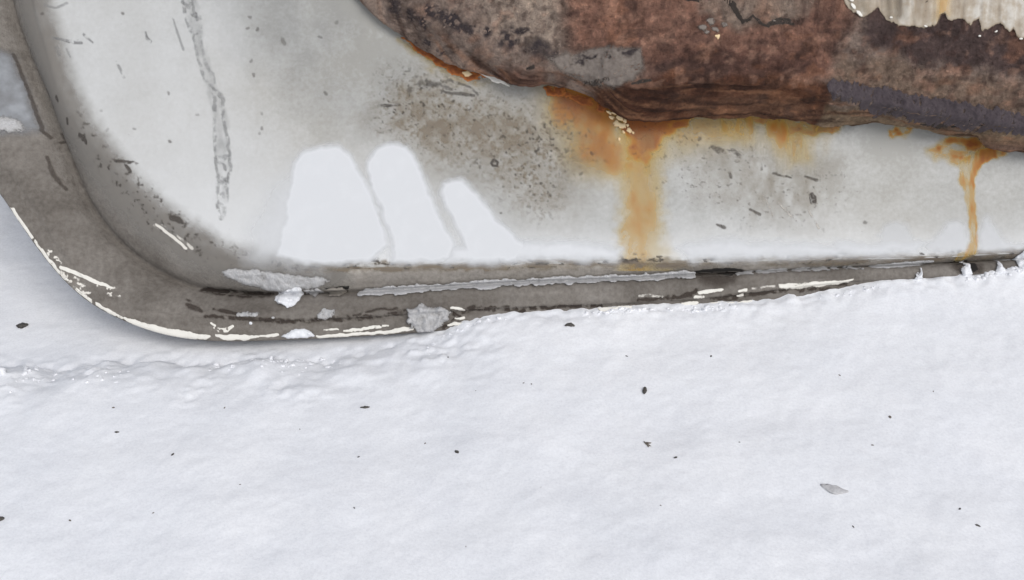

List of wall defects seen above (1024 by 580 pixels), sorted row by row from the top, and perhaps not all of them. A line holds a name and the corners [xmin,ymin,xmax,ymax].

rust [698,17,728,39]
peeling [844,0,1024,39]
rust [401,37,486,83]
rust [889,127,912,138]
rust [543,86,840,270]
rust [929,137,1007,260]
spalling [10,207,279,341]
spalling [598,294,664,311]
spalling [681,279,854,305]
spalling [316,325,414,338]